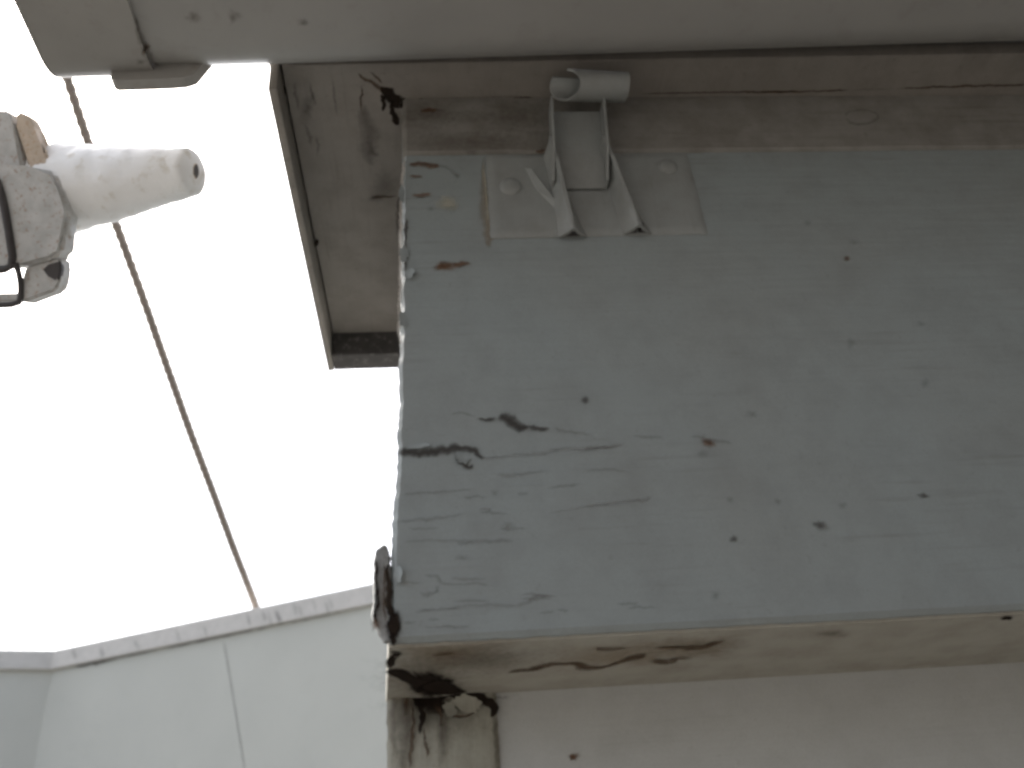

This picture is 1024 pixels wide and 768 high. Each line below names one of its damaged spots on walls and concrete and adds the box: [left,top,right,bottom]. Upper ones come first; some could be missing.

crack [359,73,422,125]
crack [651,87,845,95]
crack [907,82,1023,90]
crack [479,414,549,432]
crack [398,442,483,469]
peeling [393,566,402,583]
crack [509,641,722,673]
spalling [386,669,499,733]